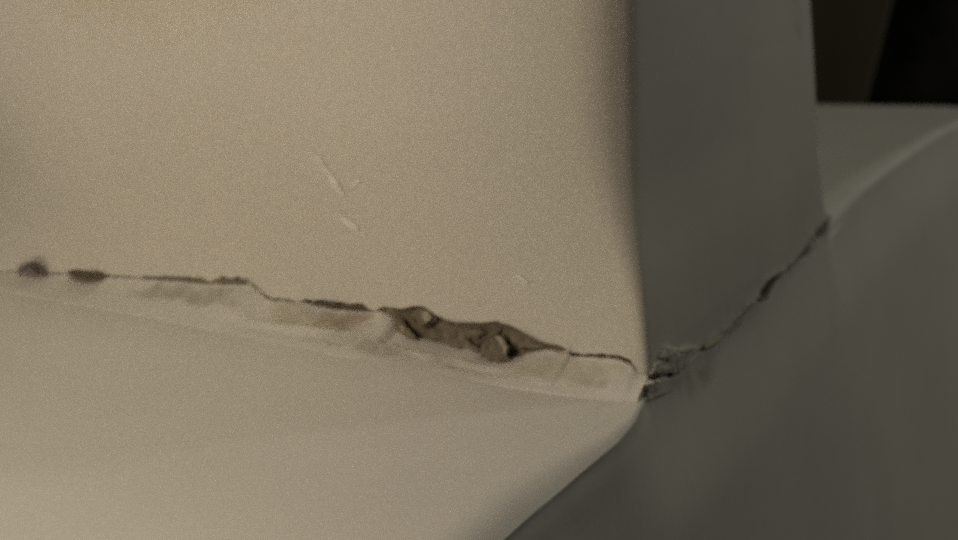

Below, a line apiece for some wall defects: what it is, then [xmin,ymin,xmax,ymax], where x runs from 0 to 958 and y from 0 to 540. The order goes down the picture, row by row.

crack [116,276,247,285]
crack [268,297,386,312]
spalling [386,306,572,364]
crack [573,302,755,379]